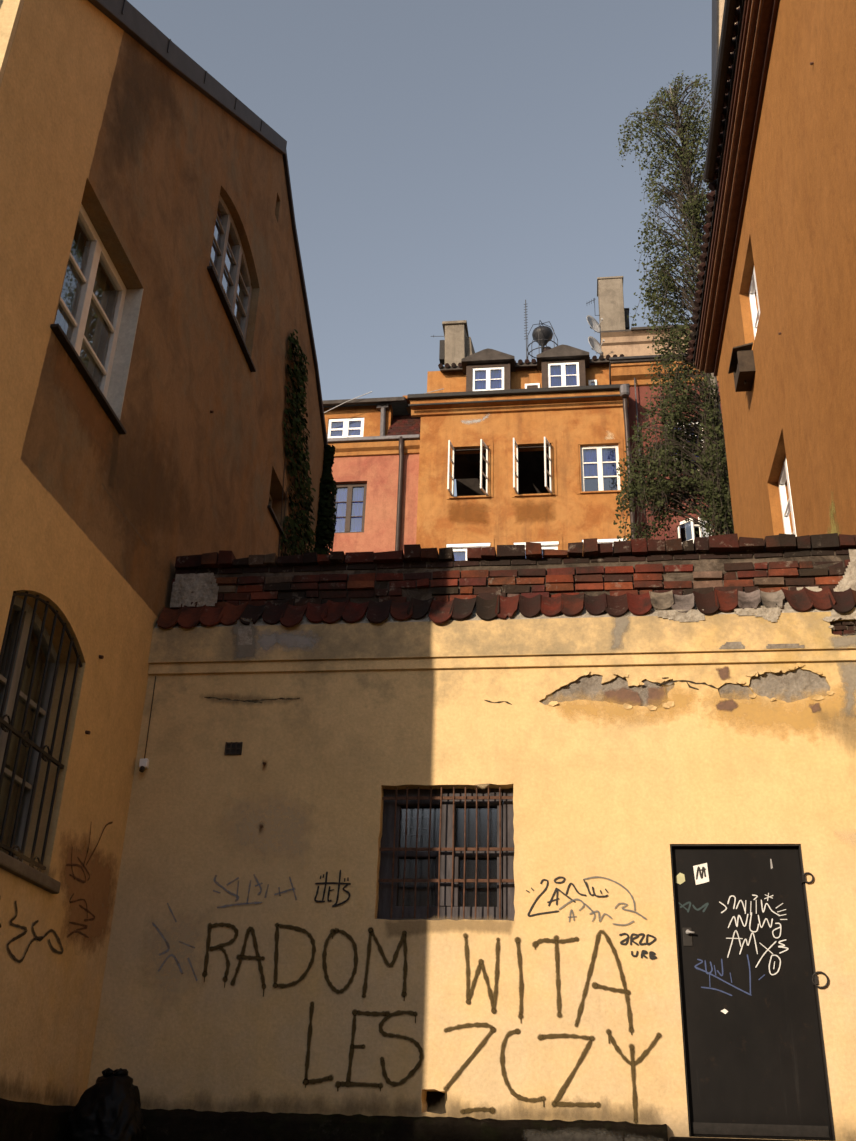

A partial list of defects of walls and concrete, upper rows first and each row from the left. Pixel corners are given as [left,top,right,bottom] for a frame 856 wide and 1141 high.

flaking render [170,573,219,607]
flaking render [833,549,856,592]
spalling [823,607,856,647]
crack [204,696,300,704]
flaking render [540,669,692,717]
damp [839,661,856,716]